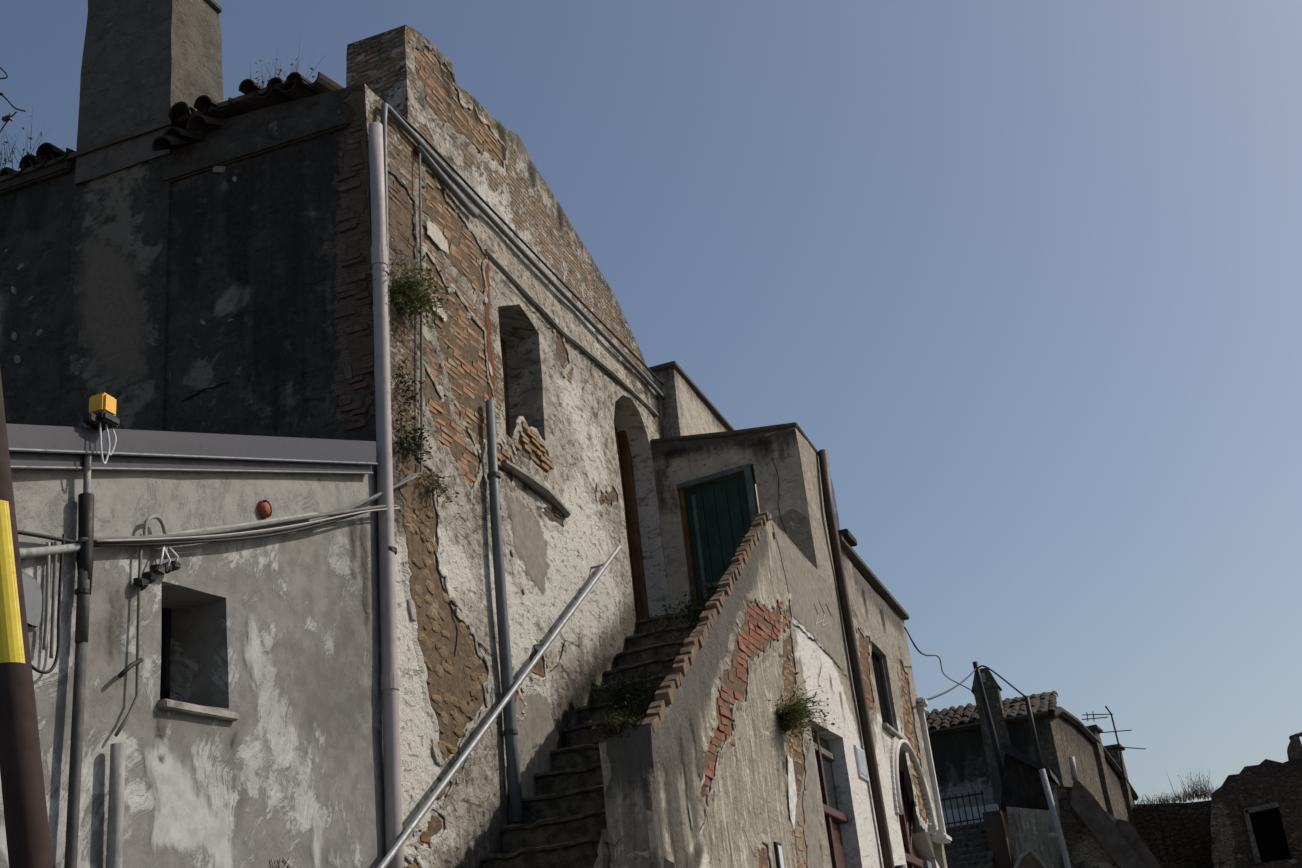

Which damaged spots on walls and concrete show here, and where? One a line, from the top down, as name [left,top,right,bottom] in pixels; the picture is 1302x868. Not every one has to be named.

flaking render [408,37,509,177]
flaking render [388,160,571,868]
flaking render [593,829,675,868]
flaking render [696,513,876,868]